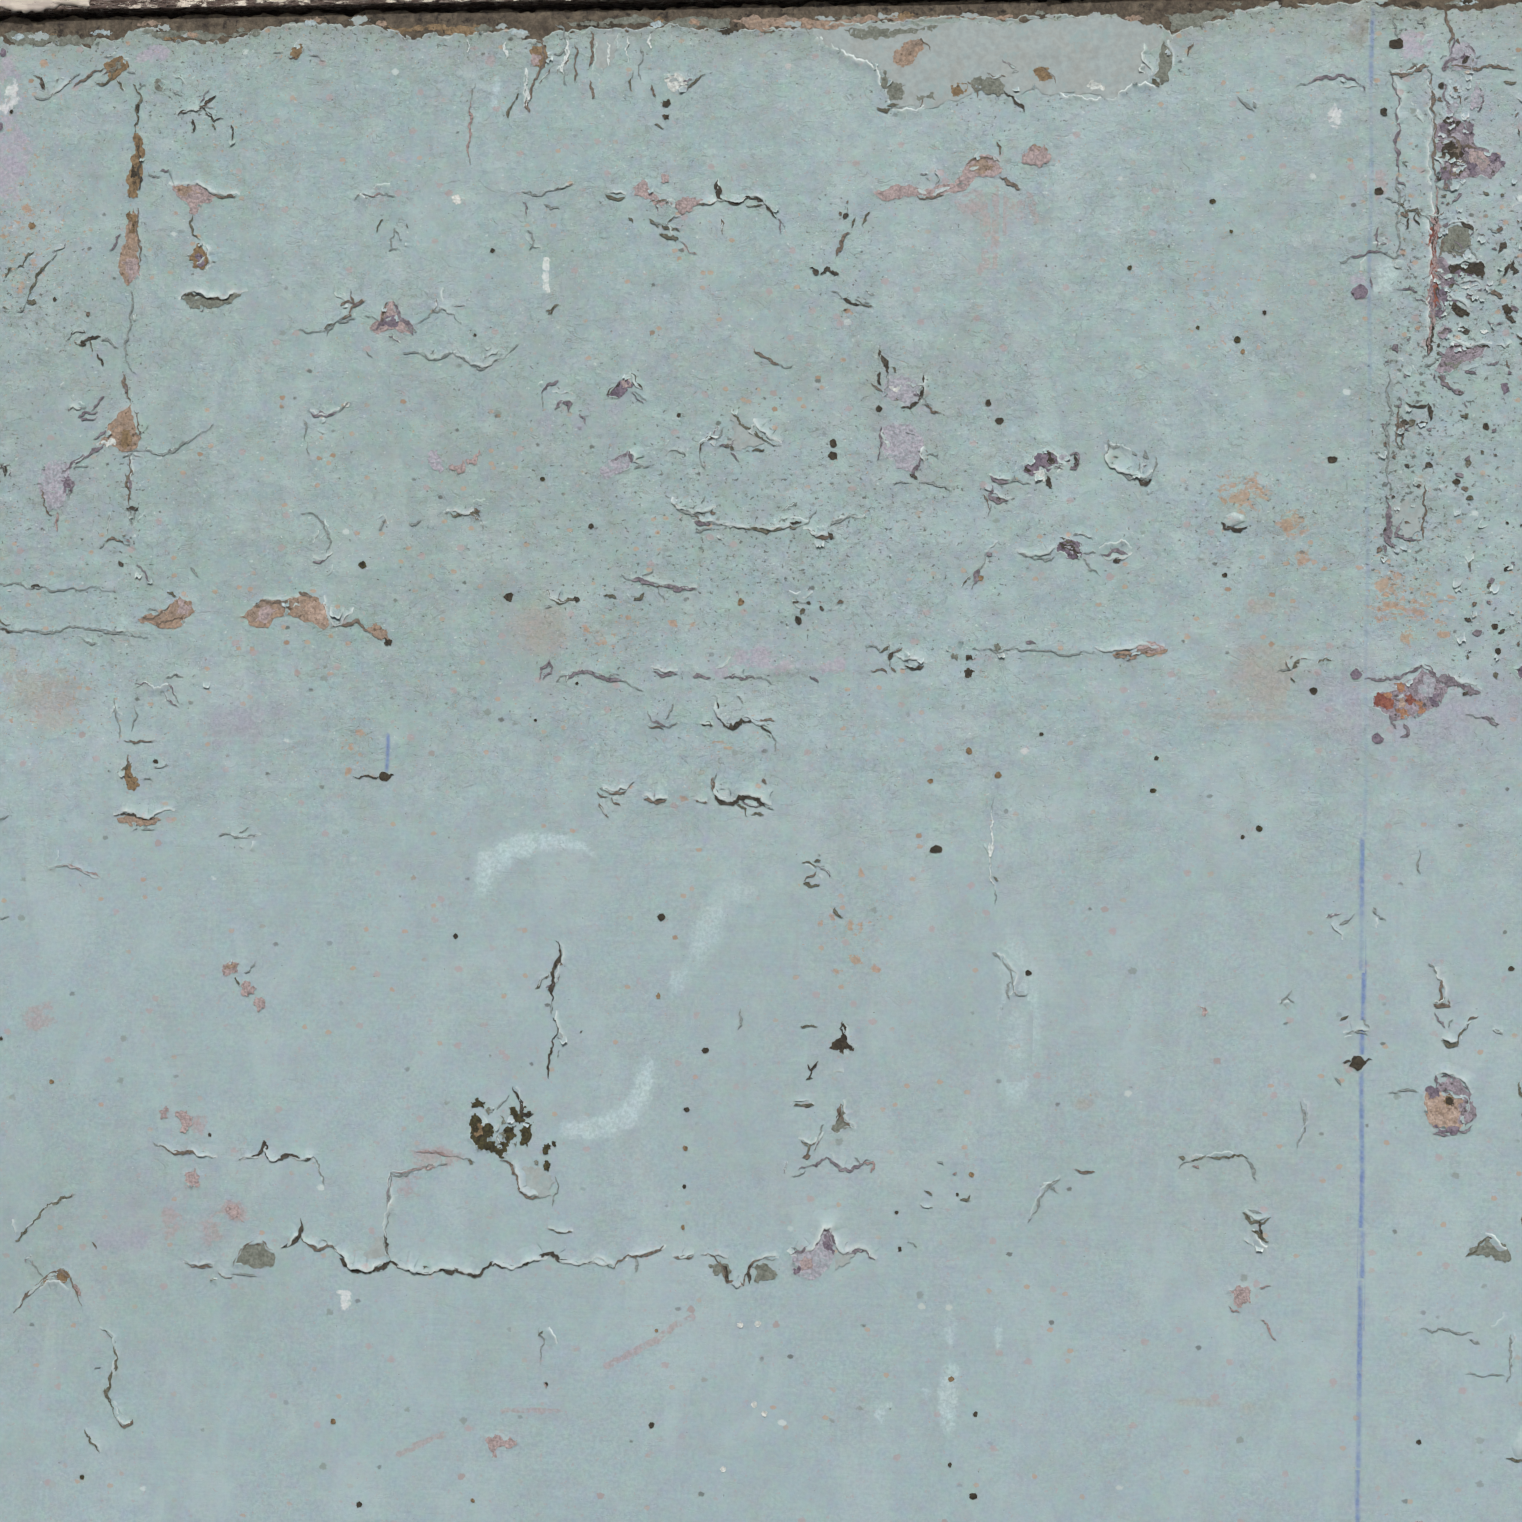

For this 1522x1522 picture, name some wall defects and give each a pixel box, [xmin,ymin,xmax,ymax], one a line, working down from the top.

peeling [0,0,1522,312]
peeling [1415,211,1519,378]
peeling [1017,442,1080,488]
crack [0,424,213,744]
peeling [236,585,392,646]
peeling [1094,633,1168,661]
peeling [1365,655,1484,737]
peeling [464,1082,559,1205]
crack [532,937,582,1079]
peeling [825,1018,860,1060]
spalling [1390,1062,1481,1137]
crack [84,1321,133,1452]